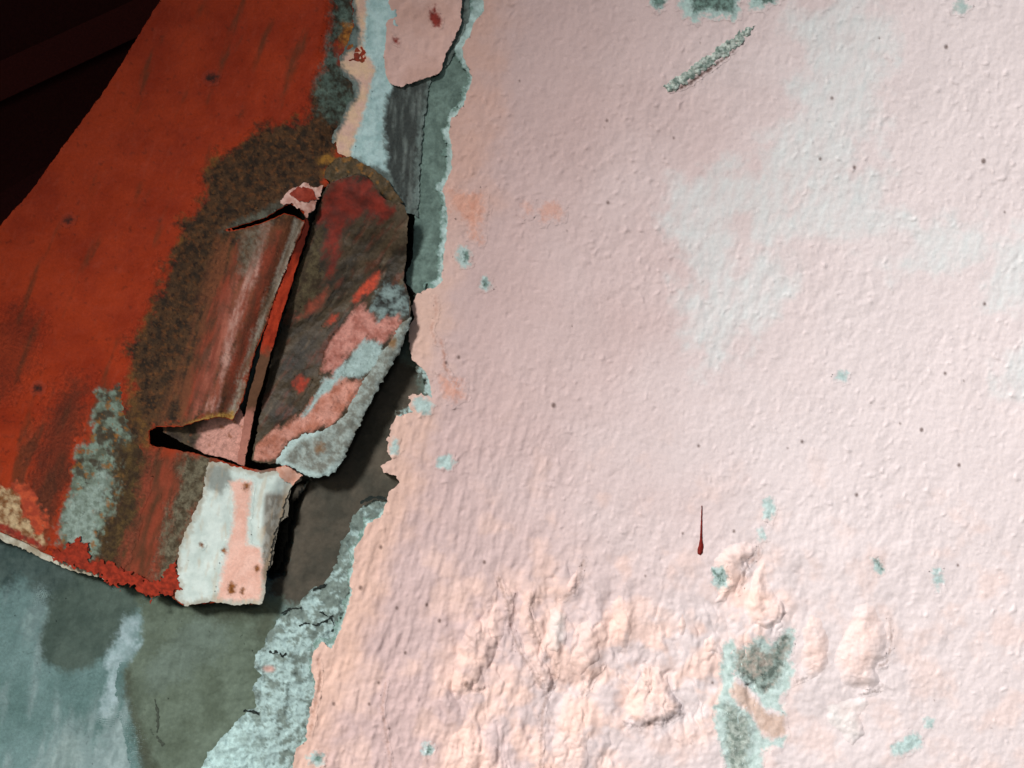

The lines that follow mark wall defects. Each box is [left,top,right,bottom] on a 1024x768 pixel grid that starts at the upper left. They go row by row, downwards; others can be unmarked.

rust [0,293,101,537]
leakage [0,351,426,768]
rust [87,84,344,582]
rust [225,579,248,598]
peeling [0,0,496,606]